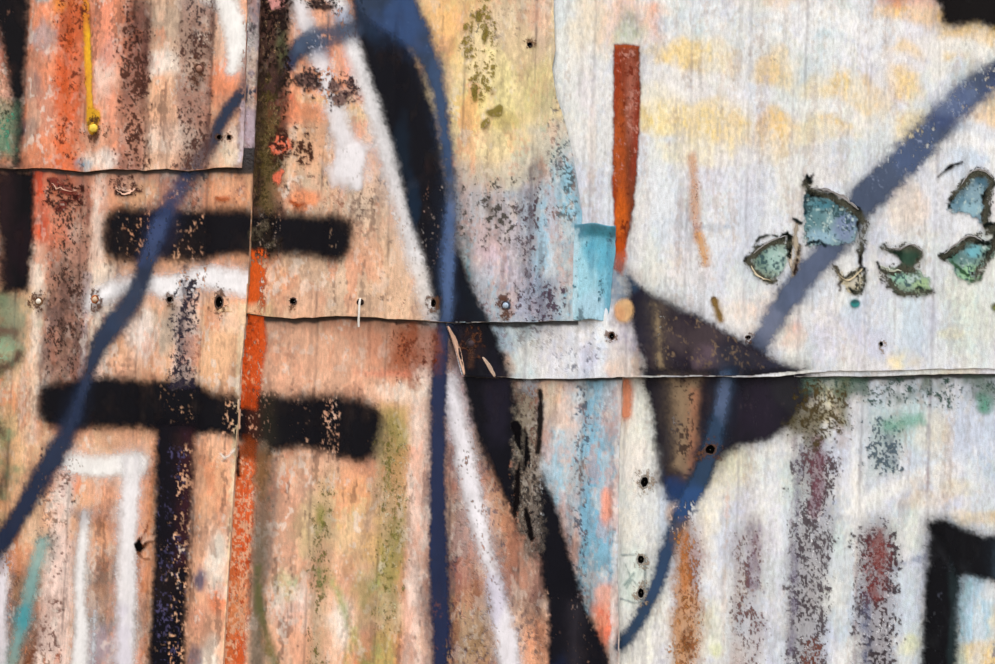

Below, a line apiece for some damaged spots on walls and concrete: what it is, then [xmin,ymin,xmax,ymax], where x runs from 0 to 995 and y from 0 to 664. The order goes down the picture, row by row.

corrosion [52,0,89,90]
corrosion [55,115,110,167]
corrosion [113,1,155,168]
corrosion [172,0,233,170]
corrosion [253,0,303,214]
corrosion [27,199,103,379]
corrosion [166,279,200,391]
corrosion [393,330,438,367]
peeling [743,174,869,308]
peeling [876,242,935,297]
peeling [938,161,995,284]